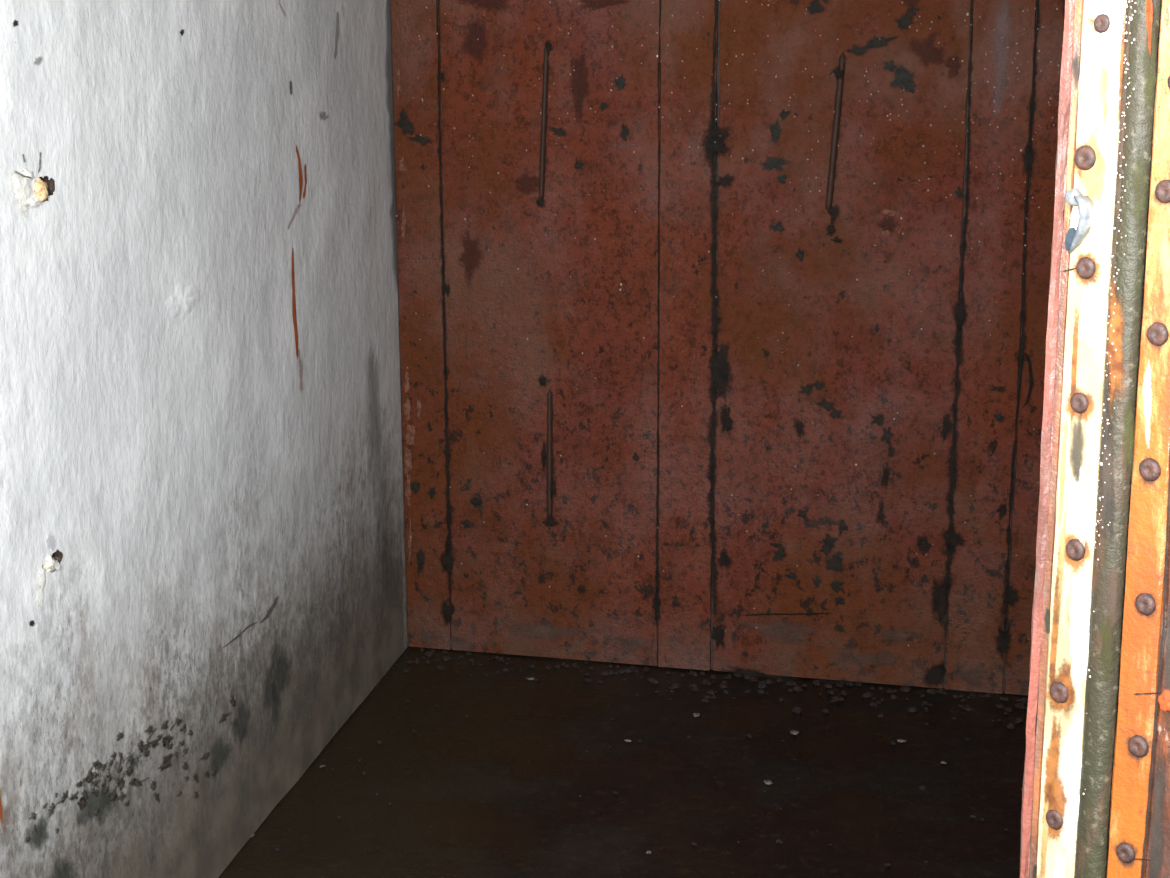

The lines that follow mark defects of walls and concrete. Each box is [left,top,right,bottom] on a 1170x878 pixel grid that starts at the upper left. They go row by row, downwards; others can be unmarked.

spalling [11,152,55,216]
water stain [26,818,48,848]
peeling [25,718,216,842]
water stain [53,549,404,878]
rust [437,0,454,625]
rust [653,0,661,619]
rust [703,0,733,611]
rust [712,625,725,647]
rust [918,0,974,628]
rust [997,0,1039,655]
rust [1029,0,1100,878]